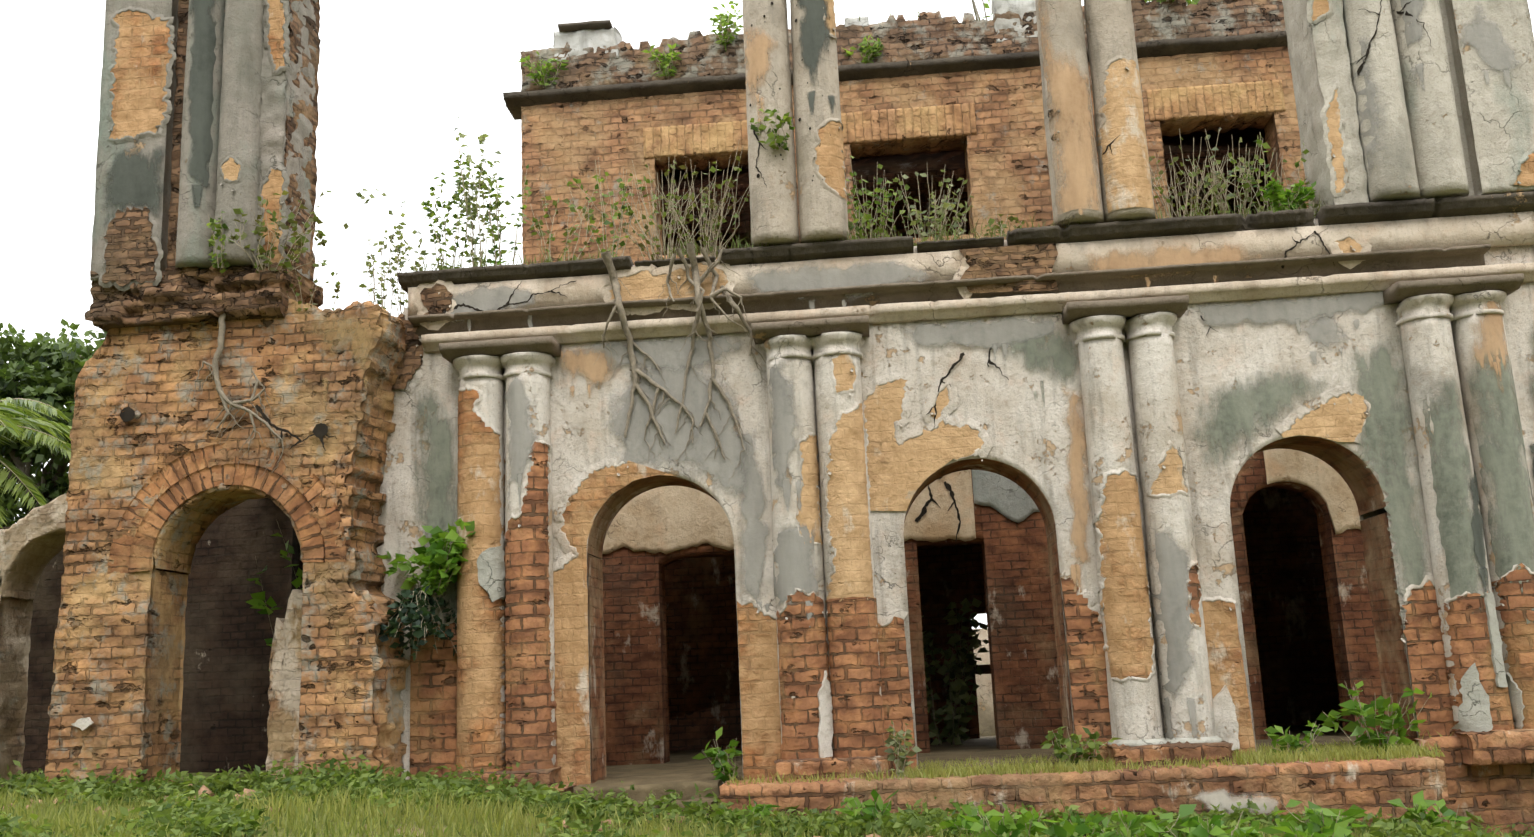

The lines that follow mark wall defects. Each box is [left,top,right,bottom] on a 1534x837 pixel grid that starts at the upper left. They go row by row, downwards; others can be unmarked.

flaking render [106,6,176,147]
flaking render [1095,55,1154,213]
crack [1356,0,1431,75]
flaking render [98,205,163,291]
flaking render [219,155,289,266]
crack [442,281,576,313]
crack [926,347,1009,427]
flaking render [1275,383,1371,444]
flaking render [406,384,675,785]
flaking render [736,354,993,780]
flaking render [1060,440,1189,763]
flaking render [1400,563,1534,739]